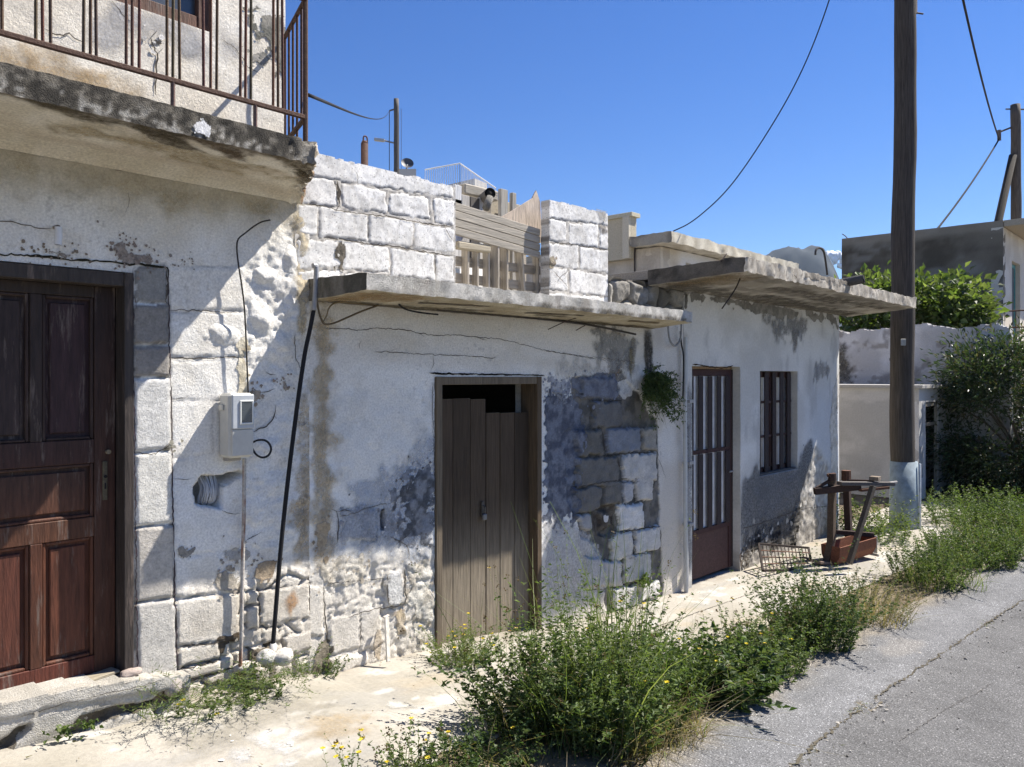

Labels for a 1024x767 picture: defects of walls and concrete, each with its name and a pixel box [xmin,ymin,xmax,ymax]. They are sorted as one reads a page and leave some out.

damp [29,100,268,174]
damp [271,155,316,184]
peeling [20,239,92,268]
peeling [106,232,195,280]
damp [289,315,346,562]
peeling [312,455,435,653]
damp [351,438,435,563]
crack [330,328,653,506]
peeling [542,369,636,548]
spalling [312,639,334,673]
crack [789,600,1023,767]